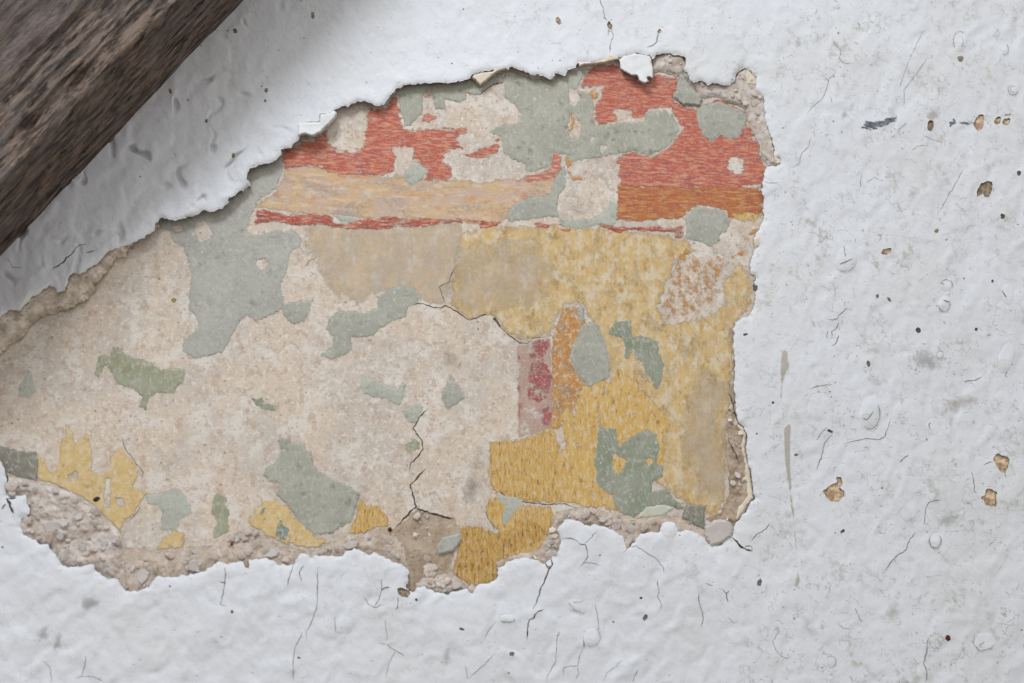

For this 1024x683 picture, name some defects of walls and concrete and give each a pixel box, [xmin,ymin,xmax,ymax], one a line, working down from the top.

spalling [973,115,1010,133]
spalling [977,181,994,197]
spalling [0,53,777,601]
crack [398,410,454,525]
spalling [993,453,1009,473]
spalling [823,477,845,502]
spalling [981,486,996,506]
crack [527,532,601,636]